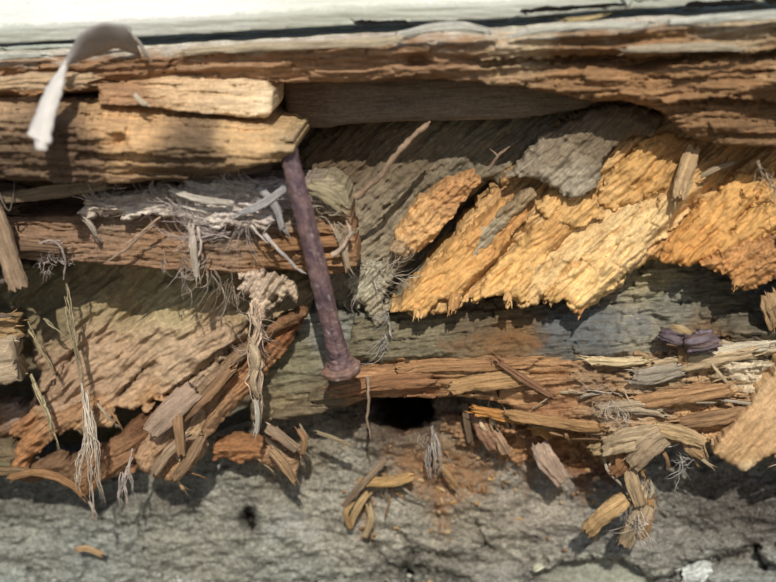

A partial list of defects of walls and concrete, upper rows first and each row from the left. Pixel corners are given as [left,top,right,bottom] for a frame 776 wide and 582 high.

crack [299,538,463,582]